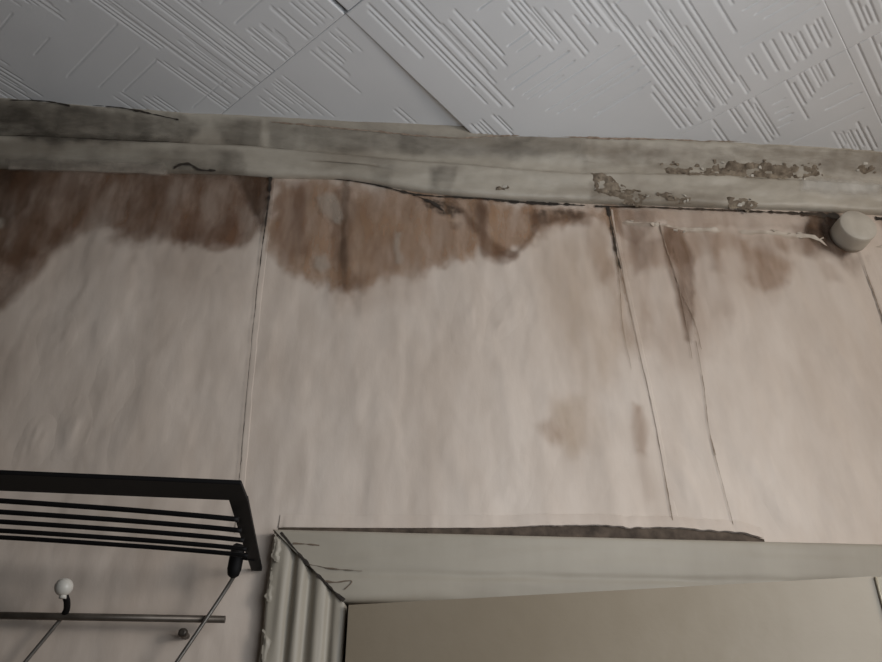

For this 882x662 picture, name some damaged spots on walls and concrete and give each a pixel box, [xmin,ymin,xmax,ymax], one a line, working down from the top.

spalling [658,159,823,180]
water stain [0,160,269,280]
water stain [271,183,581,288]
spalling [591,173,691,207]
spalling [727,197,758,213]